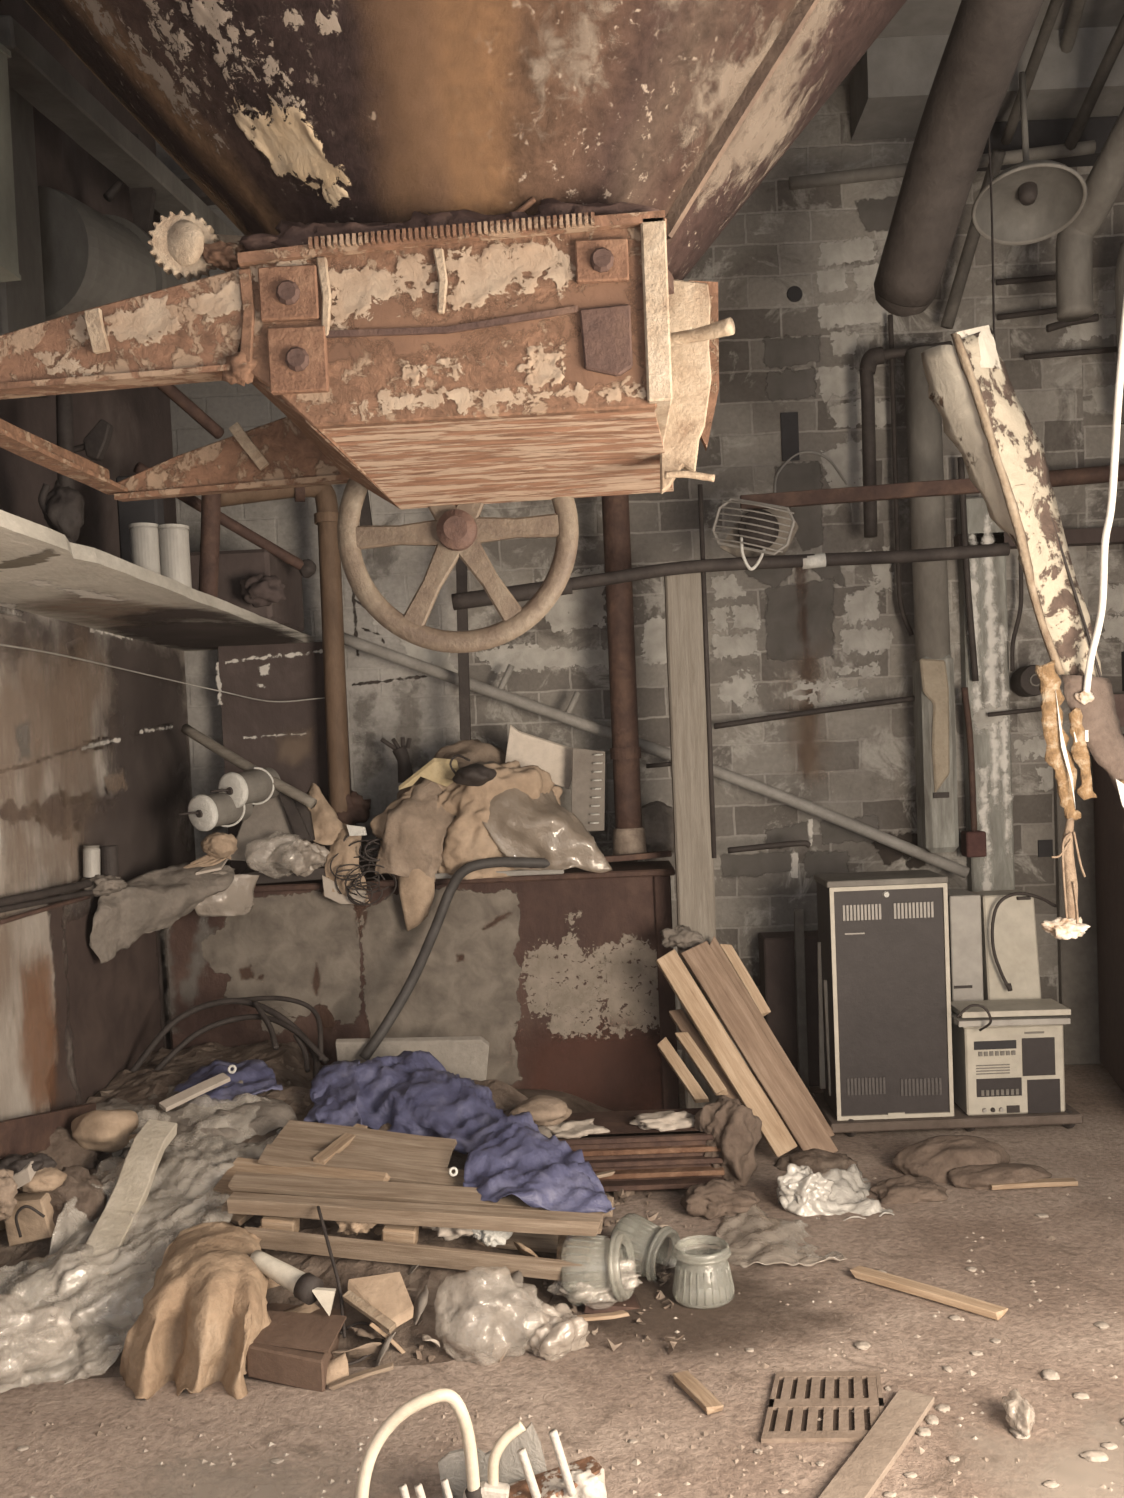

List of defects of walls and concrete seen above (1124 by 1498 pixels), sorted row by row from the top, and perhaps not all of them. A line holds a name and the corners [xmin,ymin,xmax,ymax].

corrosion [797,567,816,774]
damp [0,573,301,1111]
corrosion [356,903,369,936]
corrosion [240,966,264,980]
corrosion [313,967,336,1030]
peeling [166,887,660,1085]
corrosion [530,1021,663,1110]